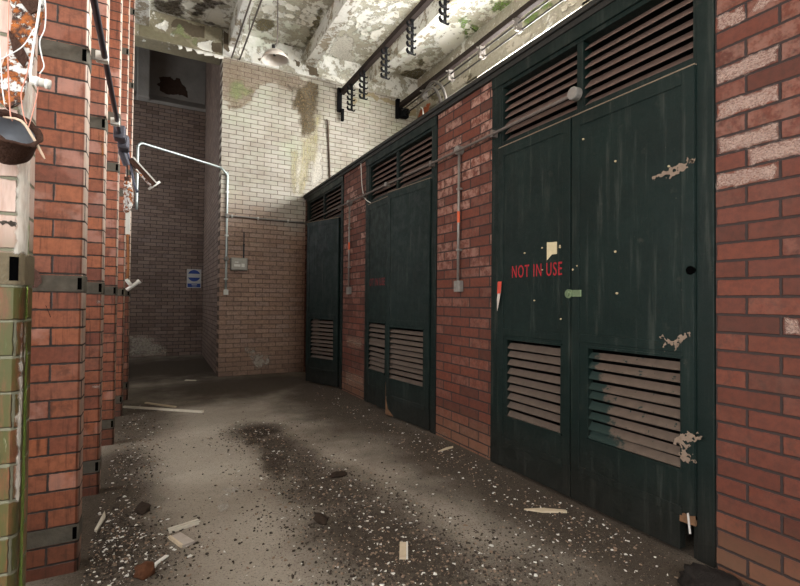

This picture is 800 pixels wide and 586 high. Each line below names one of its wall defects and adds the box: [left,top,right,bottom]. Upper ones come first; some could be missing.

peeling [355,0,403,40]
peeling [434,23,464,53]
peeling [287,53,346,83]
peeling [400,44,429,65]
peeling [451,76,468,90]
leakage [293,82,318,135]
leakage [295,151,322,192]